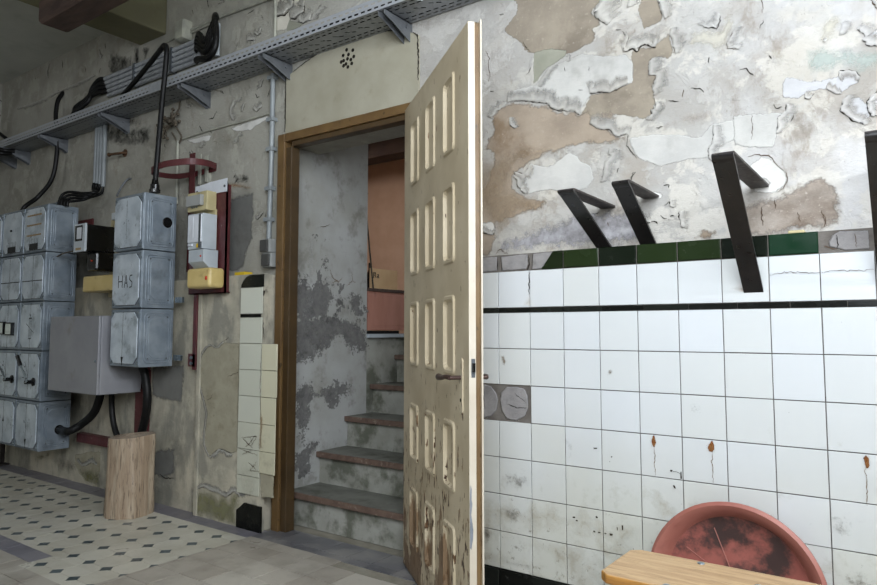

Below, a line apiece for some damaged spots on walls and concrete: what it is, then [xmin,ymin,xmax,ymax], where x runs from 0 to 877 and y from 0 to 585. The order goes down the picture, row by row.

peeling [277,0,325,31]
peeling [482,0,877,272]